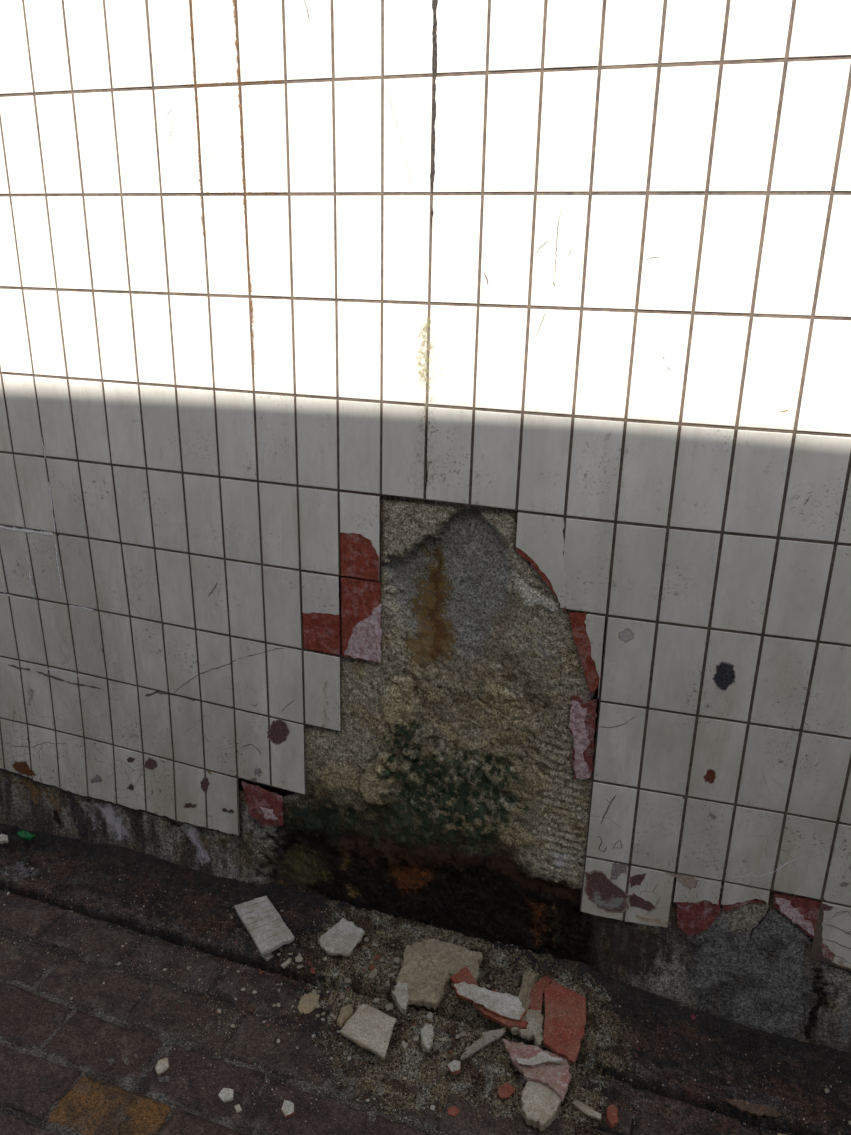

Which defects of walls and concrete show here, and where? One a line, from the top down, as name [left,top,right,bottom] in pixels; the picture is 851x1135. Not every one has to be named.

corrosion [401,543,467,674]
spalling [241,491,657,966]
leakage [53,791,130,840]
efflorescence [182,822,210,864]
leakage [285,823,667,978]
spalling [666,872,836,961]
crack [824,911,851,973]
leakage [804,968,838,1042]